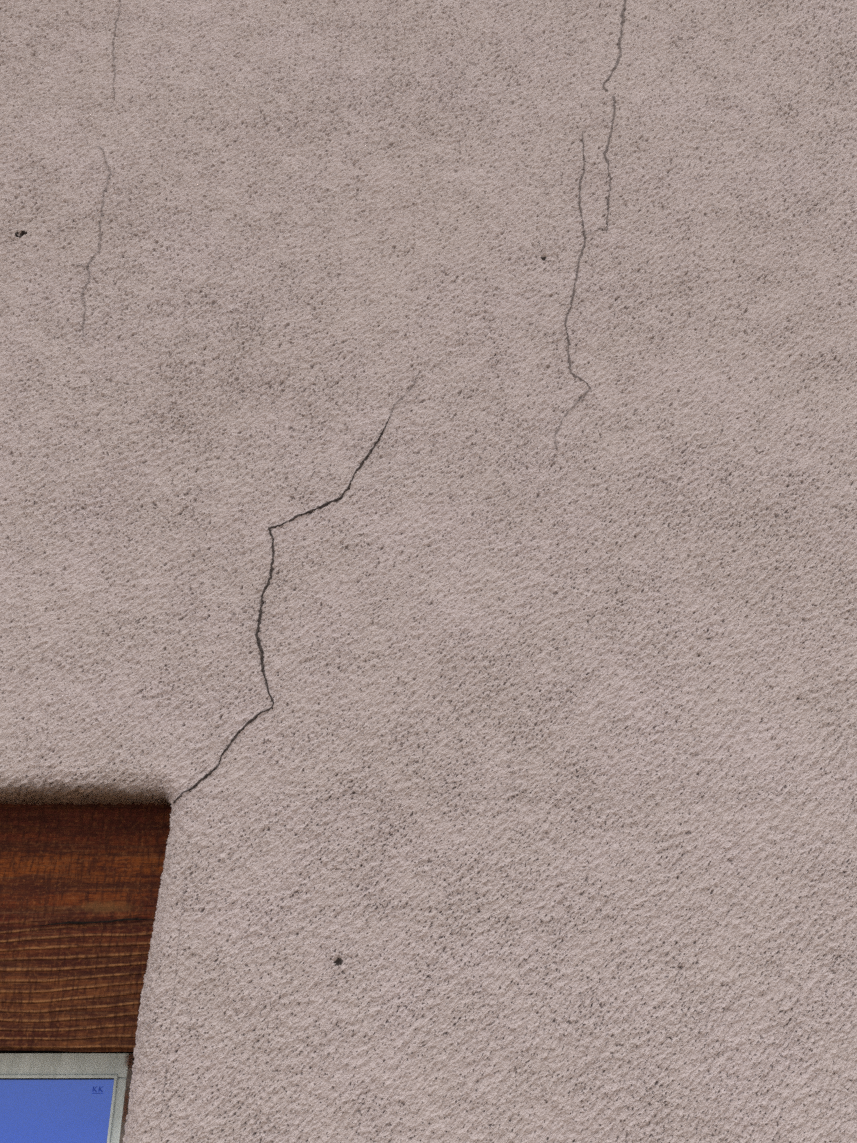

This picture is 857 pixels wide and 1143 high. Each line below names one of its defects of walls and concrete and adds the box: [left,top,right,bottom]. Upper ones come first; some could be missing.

crack [173,417,390,804]